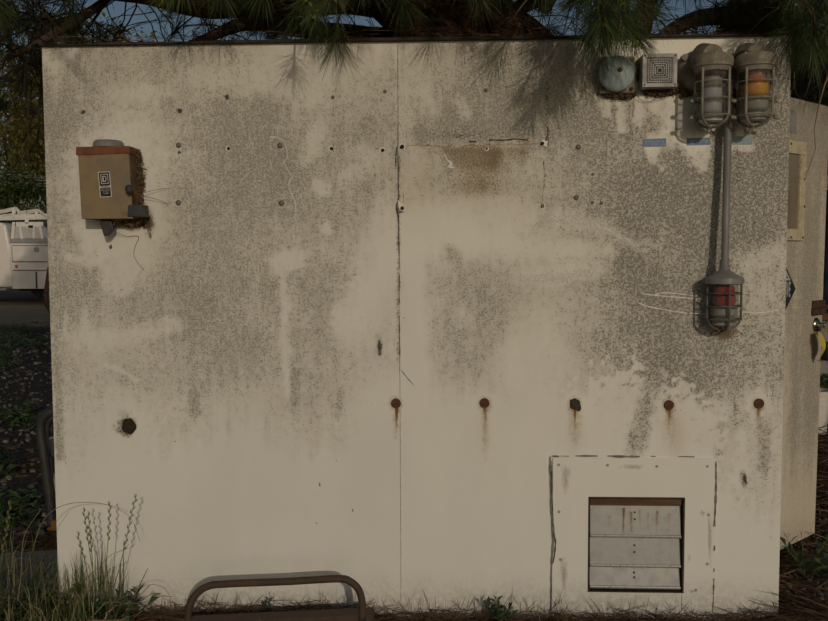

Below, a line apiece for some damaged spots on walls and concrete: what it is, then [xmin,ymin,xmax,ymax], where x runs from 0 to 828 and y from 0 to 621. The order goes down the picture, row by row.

damp [427,129,523,192]